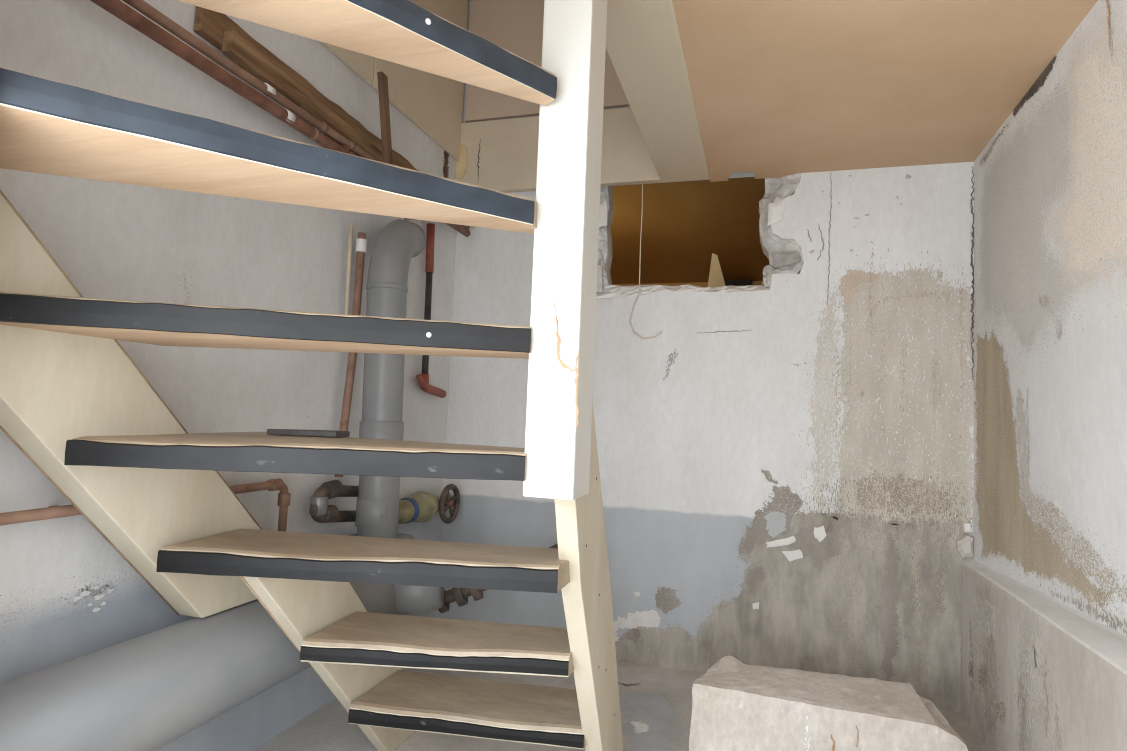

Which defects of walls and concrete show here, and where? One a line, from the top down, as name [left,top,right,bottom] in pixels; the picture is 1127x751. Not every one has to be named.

flaking render [596,173,814,300]
water stain [797,67,1127,636]
peeling [614,469,974,712]